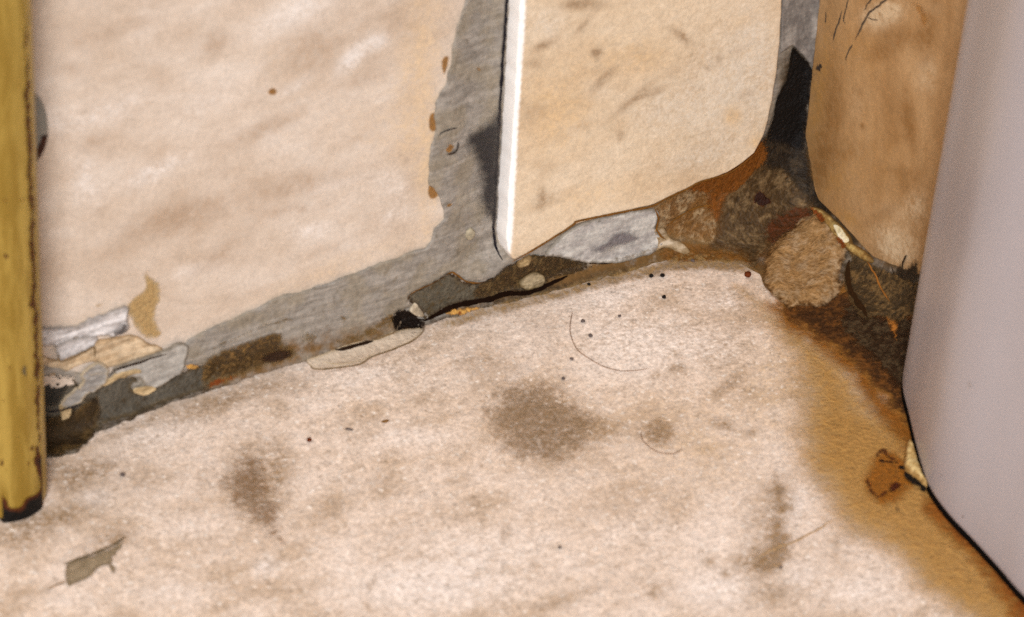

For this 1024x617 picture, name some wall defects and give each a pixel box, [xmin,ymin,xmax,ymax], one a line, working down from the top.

leakage [451,117,832,324]
spalling [31,306,219,455]
crack [418,276,568,321]
corrosion [771,285,913,427]
leakage [845,253,920,321]
corrosion [866,448,911,510]
corrosion [924,496,1024,617]